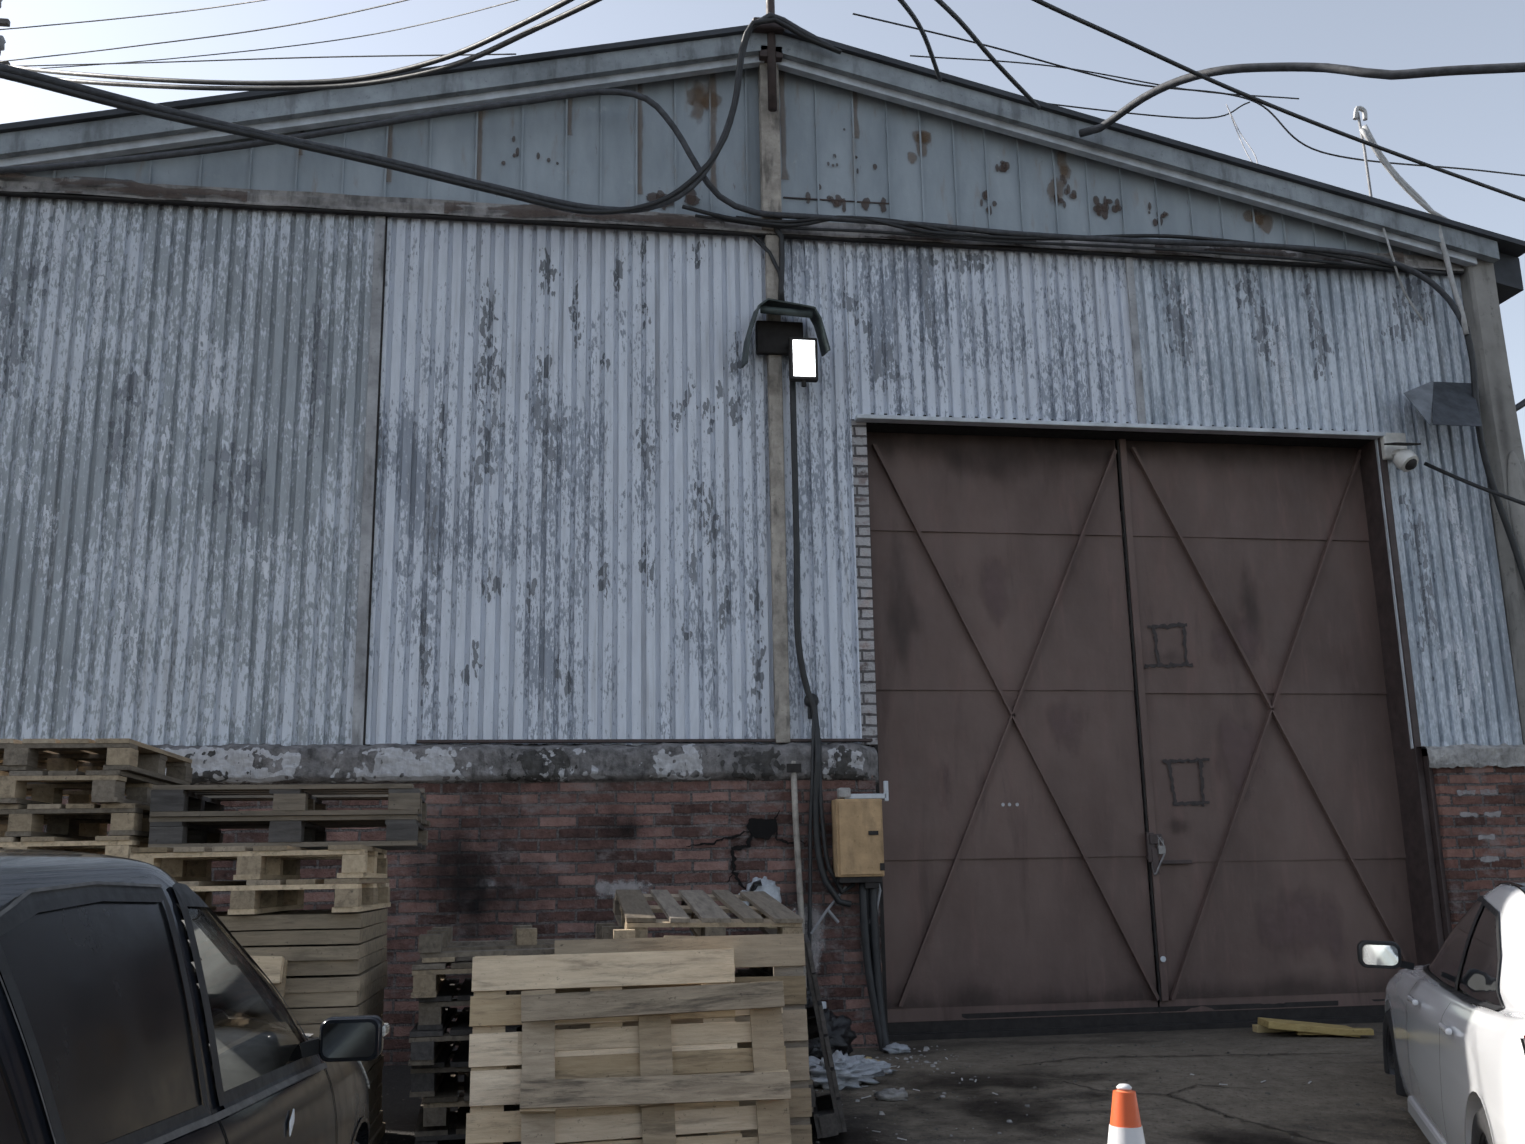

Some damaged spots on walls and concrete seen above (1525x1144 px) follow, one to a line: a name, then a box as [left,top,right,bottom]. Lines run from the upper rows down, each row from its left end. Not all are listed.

corrosion [805,192,886,213]
peeling [0,202,115,398]
peeling [100,350,178,496]
peeling [463,279,506,485]
peeling [531,247,585,349]
peeling [1143,264,1217,402]
peeling [1228,268,1339,419]
peeling [202,432,301,592]
peeling [1396,450,1498,719]
peeling [160,745,302,785]
peeling [325,746,614,783]
peeling [639,744,785,781]